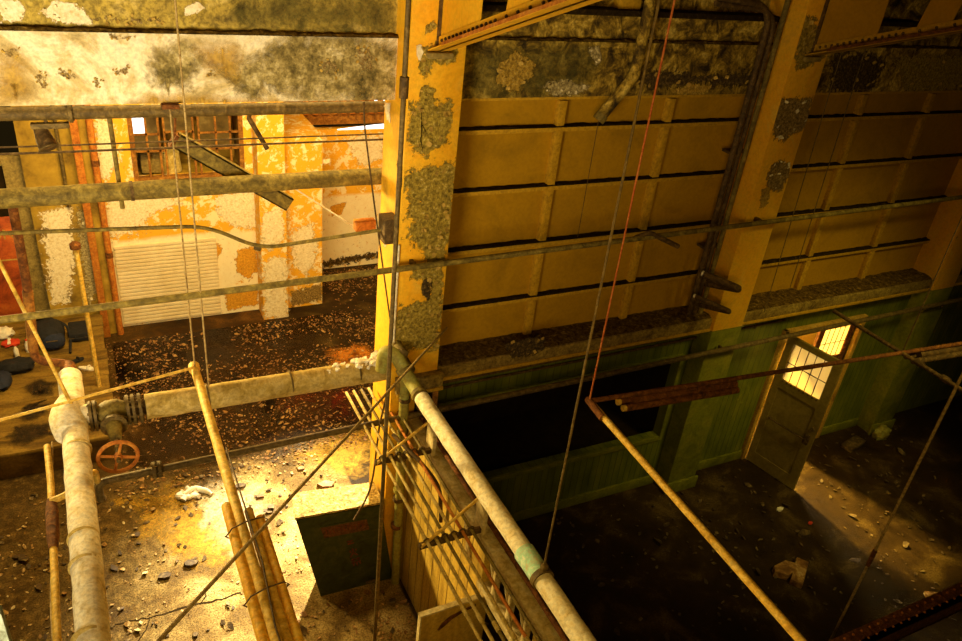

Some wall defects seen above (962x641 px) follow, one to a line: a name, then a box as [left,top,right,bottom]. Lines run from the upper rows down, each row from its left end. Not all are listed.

peeling [38,0,164,41]
damp [148,36,397,101]
peeling [772,96,813,143]
peeling [343,132,383,168]
peeling [395,21,458,353]
spalling [758,159,790,210]
peeling [105,198,186,241]
spalling [34,205,97,305]
peeling [214,193,386,319]